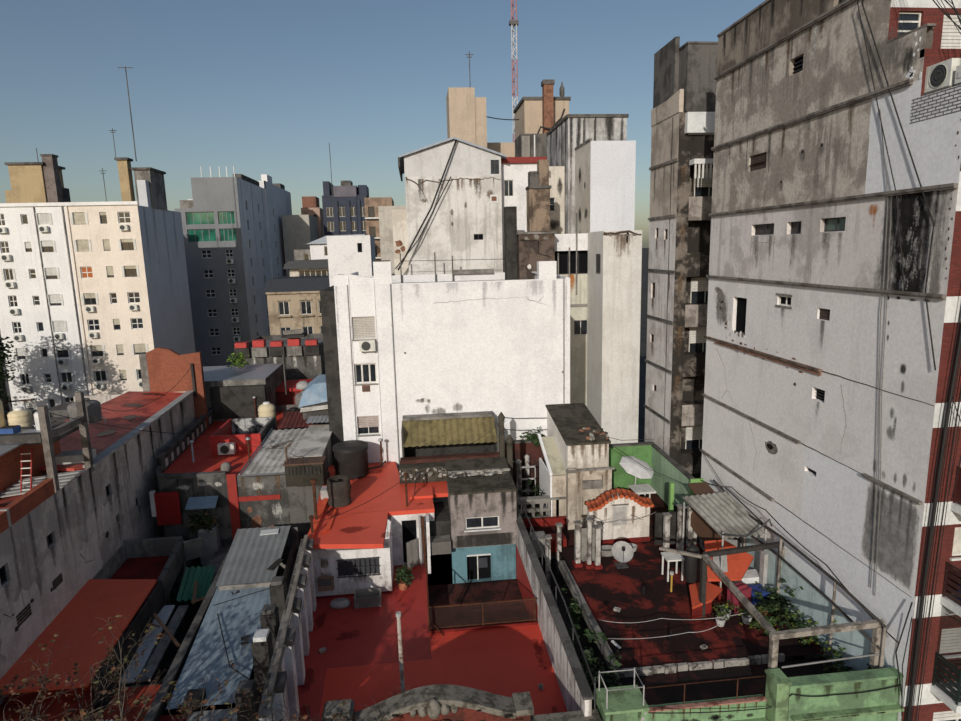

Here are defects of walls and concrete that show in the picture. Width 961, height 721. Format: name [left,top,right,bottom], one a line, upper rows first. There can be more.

leakage [723,0,774,54]
leakage [866,36,914,71]
crack [405,177,501,201]
leakage [878,190,947,302]
crack [433,297,547,305]
leakage [863,475,919,588]